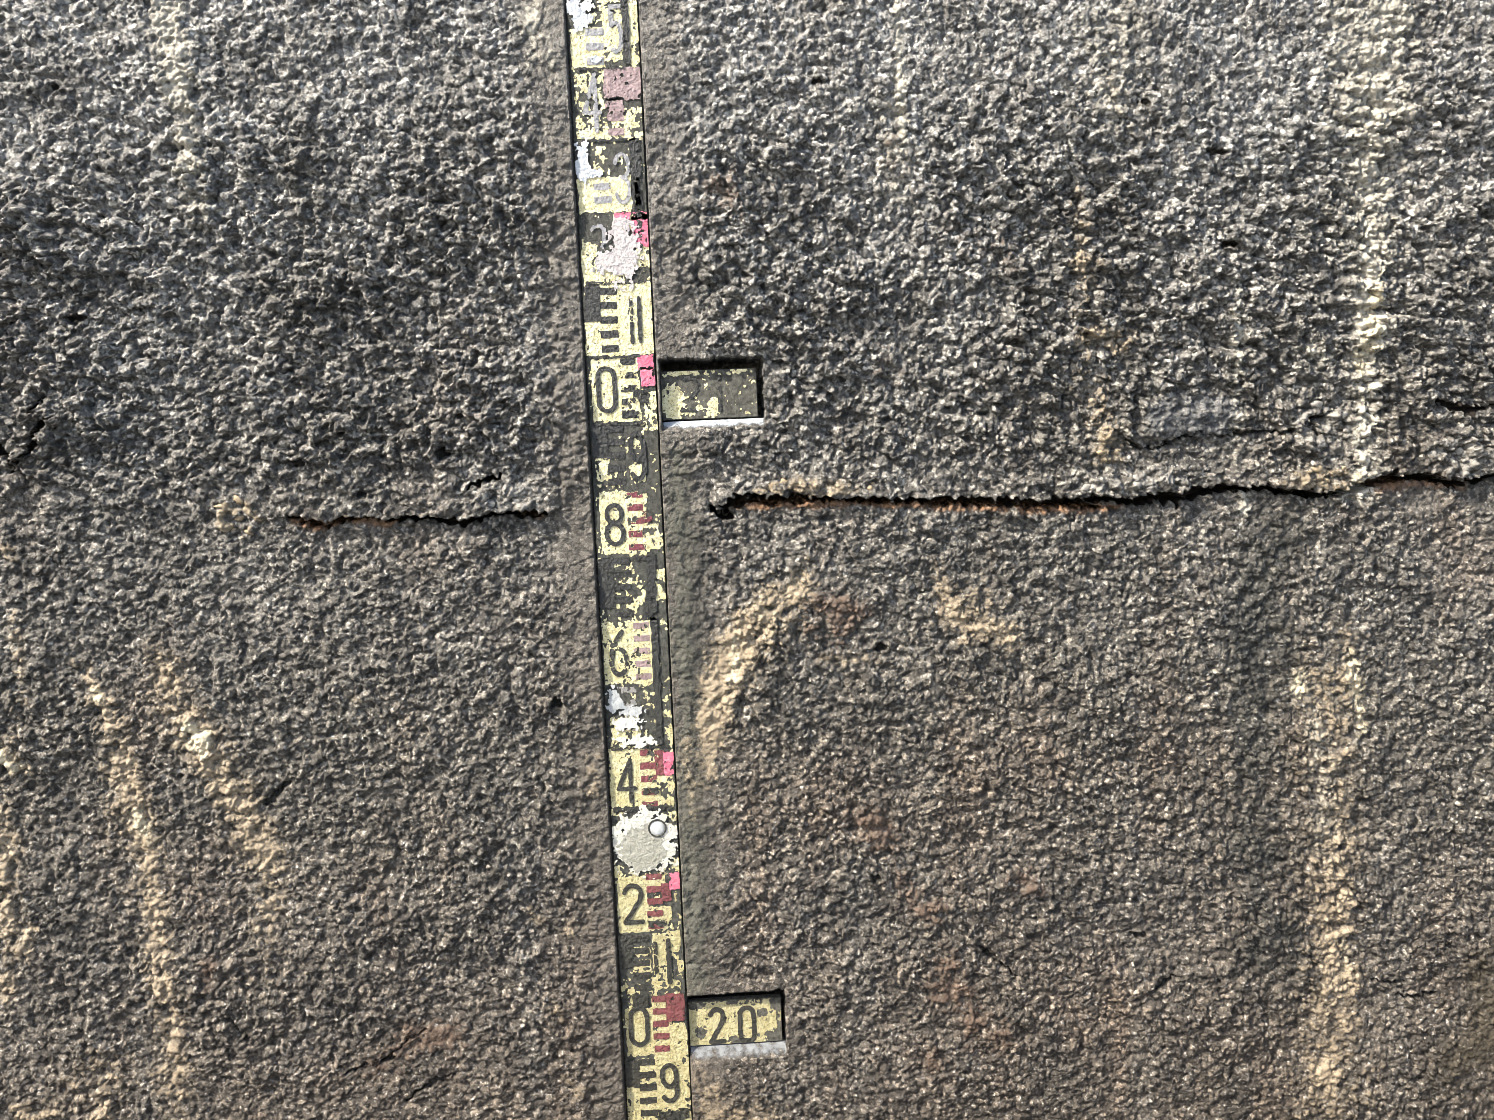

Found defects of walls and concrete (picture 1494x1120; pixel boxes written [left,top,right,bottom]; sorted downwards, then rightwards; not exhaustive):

crack [0,398,53,473]
crack [1124,408,1336,450]
crack [1435,398,1494,417]
crack [287,472,548,530]
crack [709,468,1494,520]
water stain [0,736,31,777]
water stain [148,645,286,942]
water stain [0,806,39,1002]
water stain [73,661,189,1120]
water stain [11,1102,62,1120]